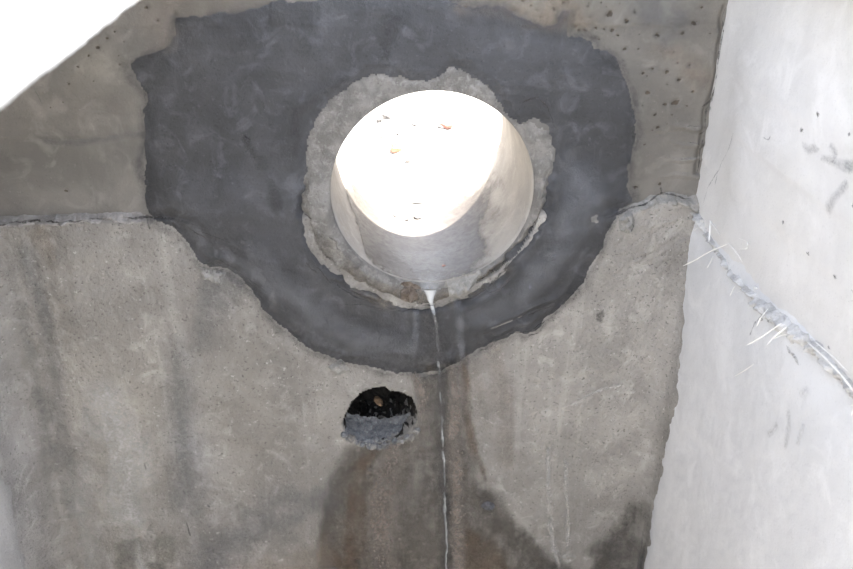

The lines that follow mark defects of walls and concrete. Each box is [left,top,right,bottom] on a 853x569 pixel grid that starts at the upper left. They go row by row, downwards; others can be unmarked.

crack [0,218,106,226]
crack [127,216,250,280]
spalling [341,372,430,451]
water stain [321,364,558,569]
water stain [590,507,642,569]